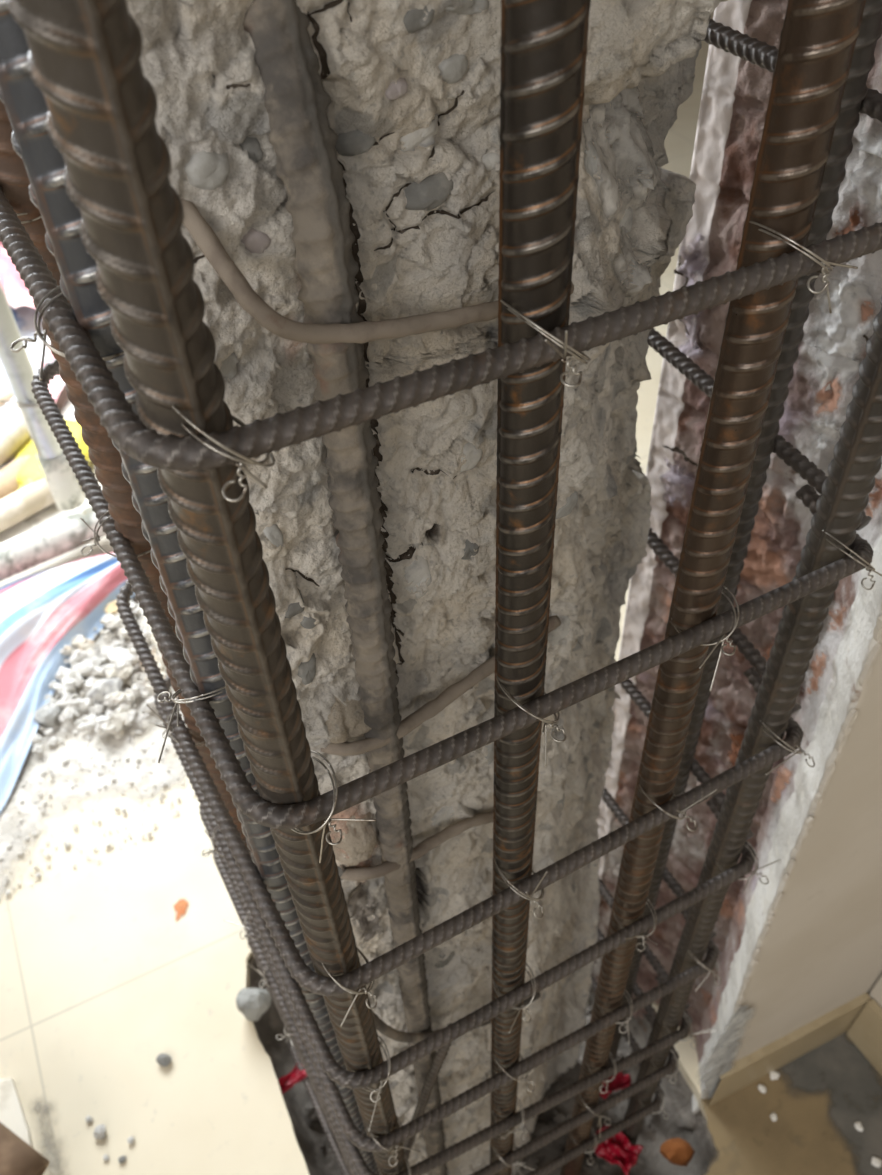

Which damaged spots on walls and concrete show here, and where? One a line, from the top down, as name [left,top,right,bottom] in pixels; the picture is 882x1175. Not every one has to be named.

spalling [0,0,233,437]
crack [307,0,352,80]
crack [338,90,493,388]
spalling [498,0,665,347]
spalling [736,0,882,270]
rust [834,206,867,237]
spalling [33,300,321,805]
crack [370,419,423,674]
crack [411,467,456,479]
spalling [494,358,566,717]
spalling [660,272,882,640]
spalling [248,956,343,1175]